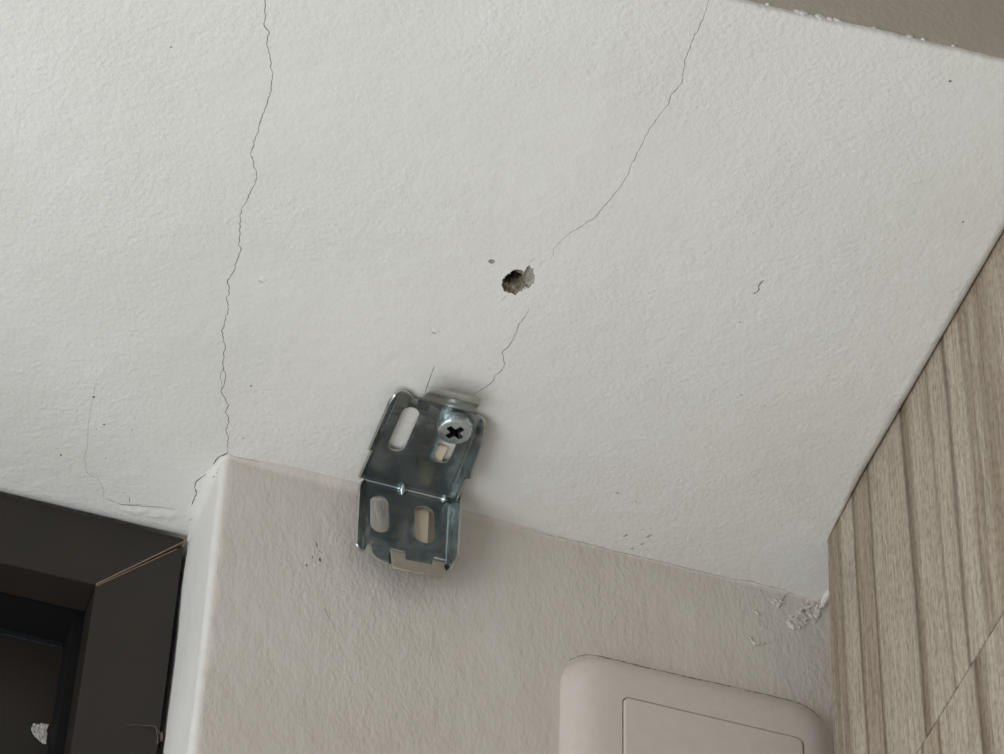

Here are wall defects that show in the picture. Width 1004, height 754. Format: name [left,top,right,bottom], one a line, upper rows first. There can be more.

crack [529,0,709,264]
crack [189,3,273,521]
spalling [502,265,535,295]
crack [474,310,529,395]
peeling [786,589,829,631]